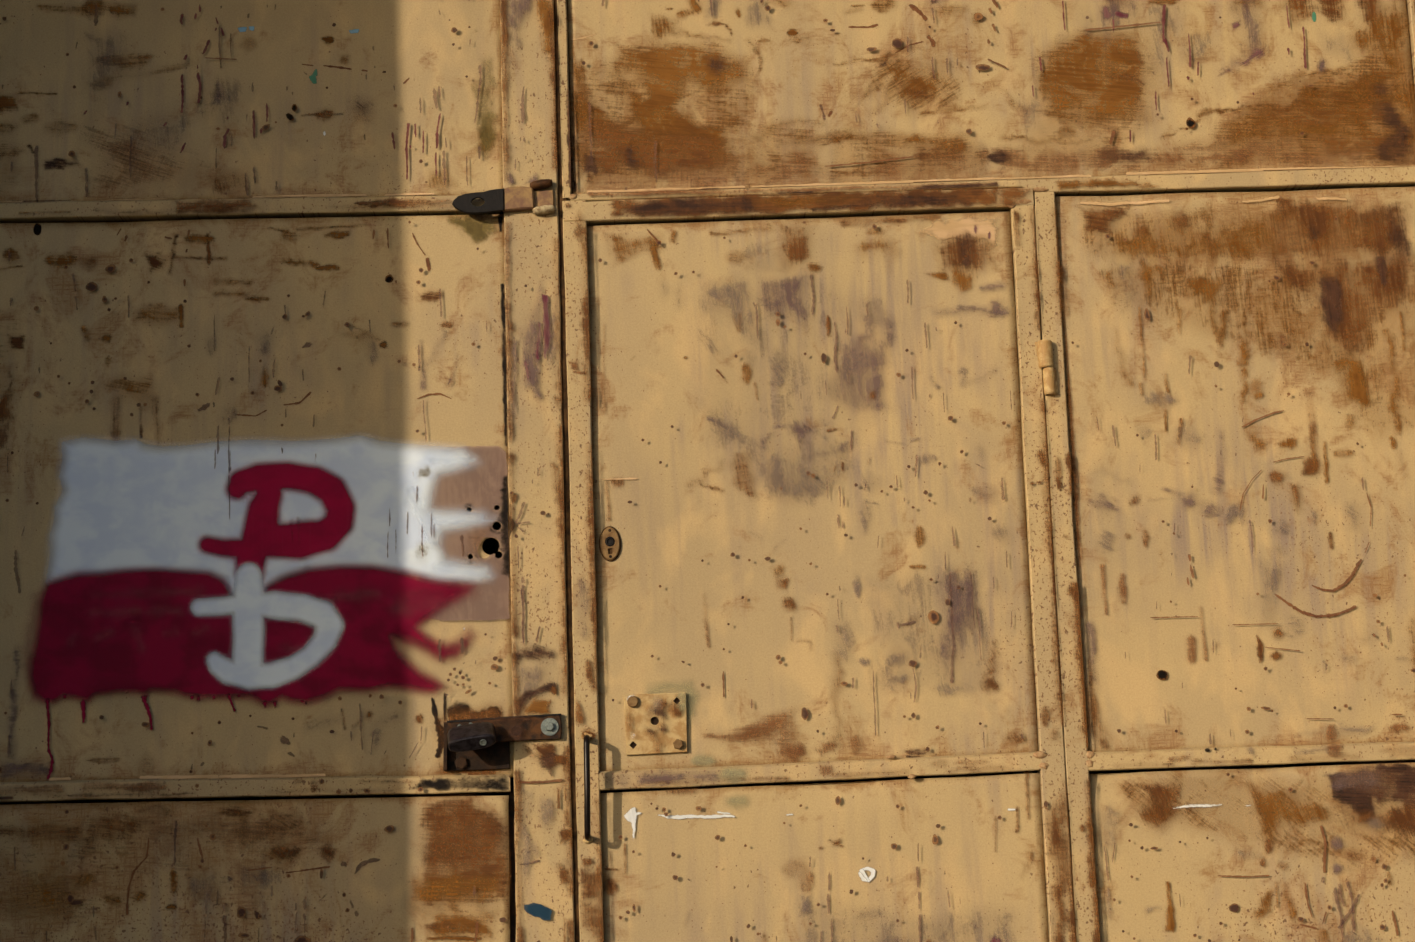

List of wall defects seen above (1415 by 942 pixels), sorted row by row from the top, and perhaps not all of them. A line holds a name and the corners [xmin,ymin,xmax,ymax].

rust [554,0,1415,275]
rust [929,238,991,290]
rust [1030,450,1072,494]
rust [730,552,795,632]
rust [928,585,961,624]
rust [1100,564,1127,615]
rust [986,653,998,690]
rust [1188,630,1207,662]
rust [1256,629,1282,671]
rust [707,708,860,775]
rust [413,799,507,941]
rust [1353,805,1415,887]